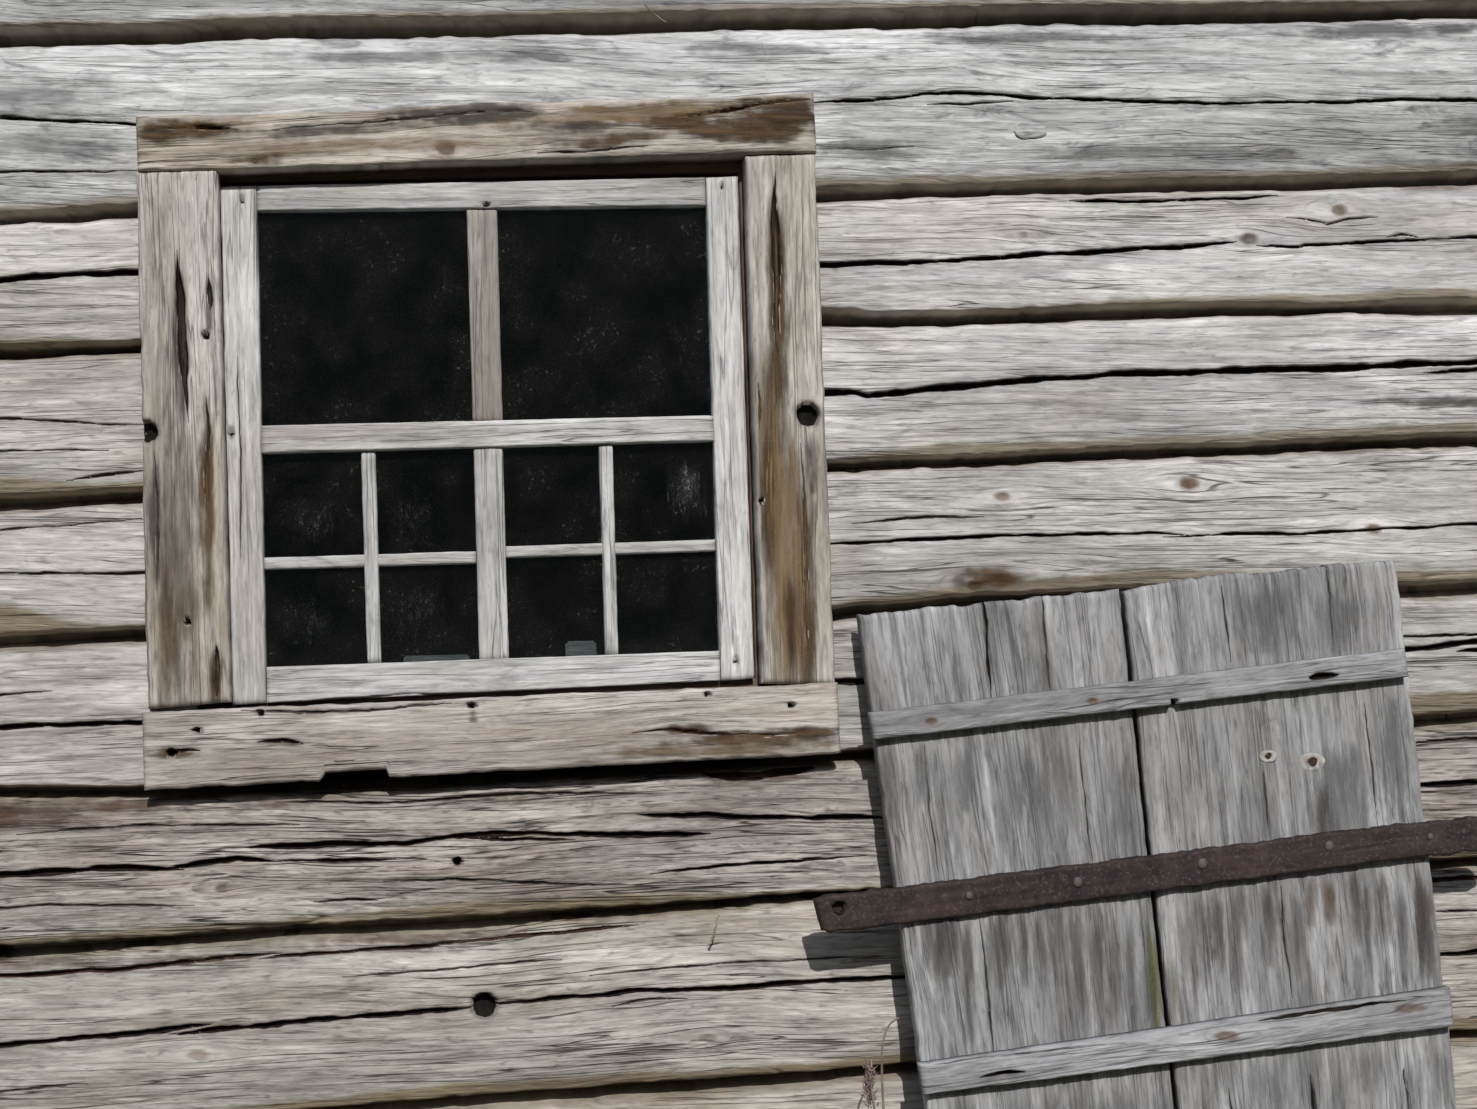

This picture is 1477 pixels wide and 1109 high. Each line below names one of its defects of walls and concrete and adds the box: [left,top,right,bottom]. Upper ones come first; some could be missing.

crack [819,195,1477,268]
crack [758,171,780,429]
crack [824,360,1477,398]
crack [799,443,807,519]
crack [830,516,1477,690]
crack [0,728,883,909]
crack [0,924,905,1048]
crack [965,915,1024,1109]
crack [0,1083,88,1093]